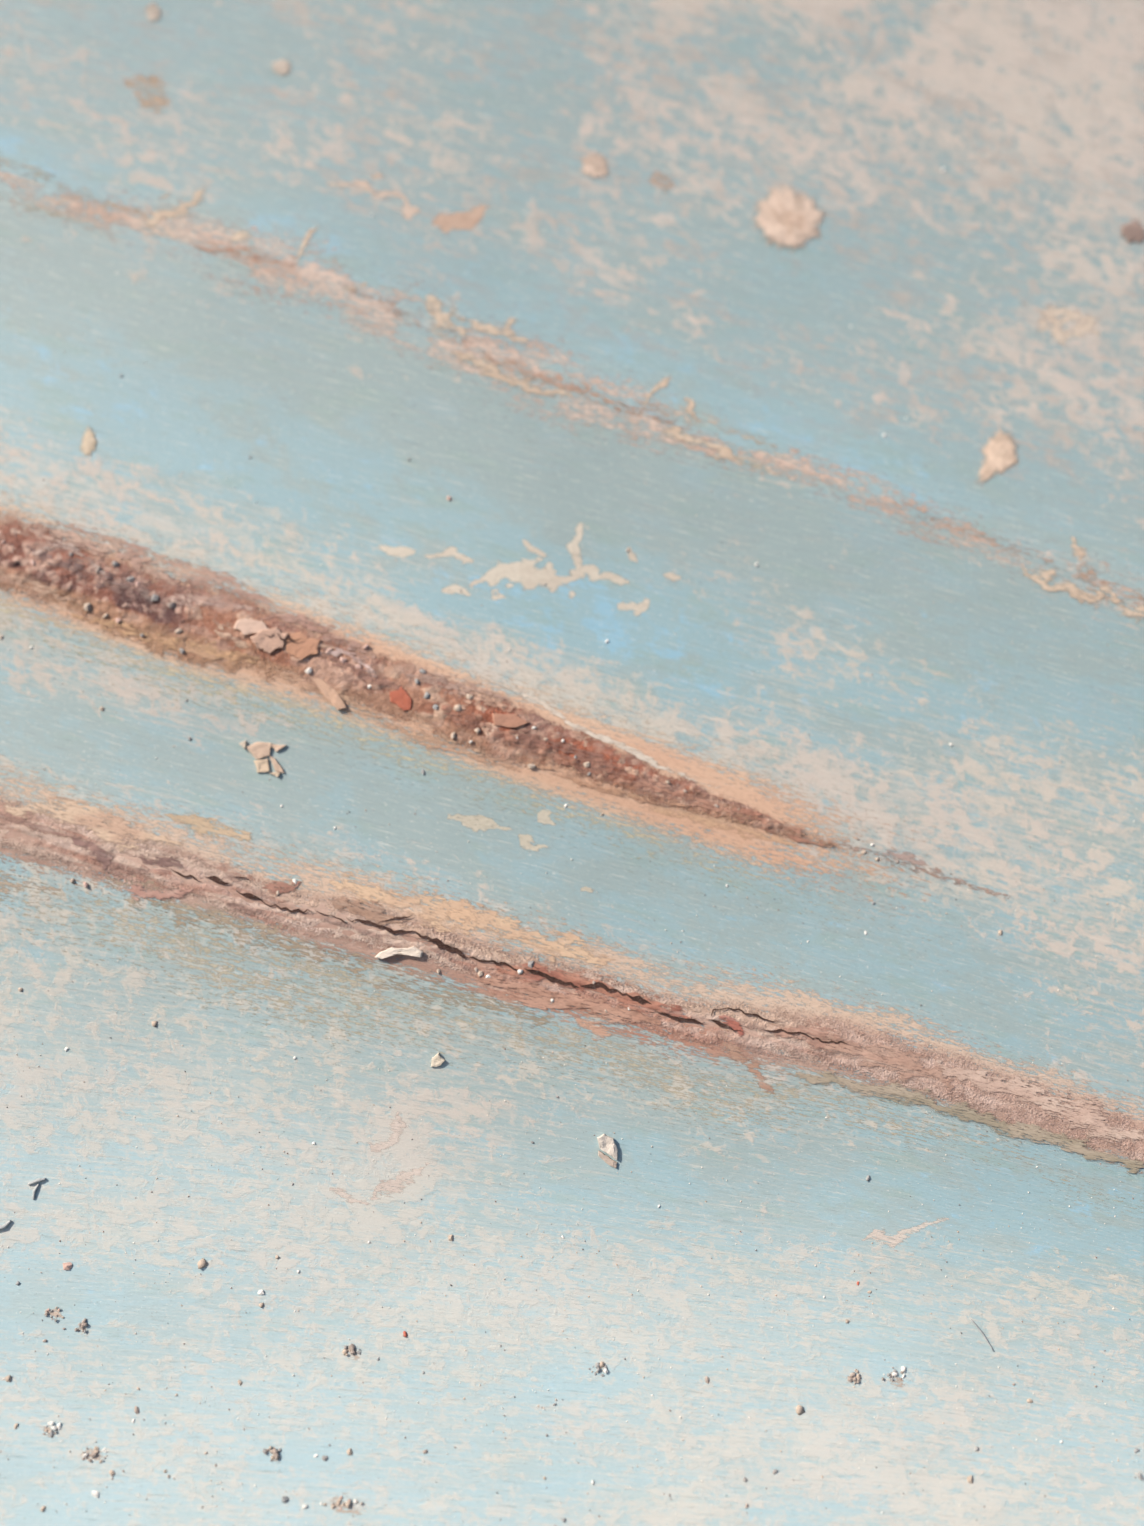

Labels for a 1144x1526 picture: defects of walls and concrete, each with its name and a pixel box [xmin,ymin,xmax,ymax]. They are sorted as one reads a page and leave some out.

peeling [326,172,490,236]
corrosion [0,477,1009,925]
peeling [378,523,650,617]
corrosion [0,149,1144,623]
crack [169,869,847,1044]
corrosion [0,755,1144,1174]